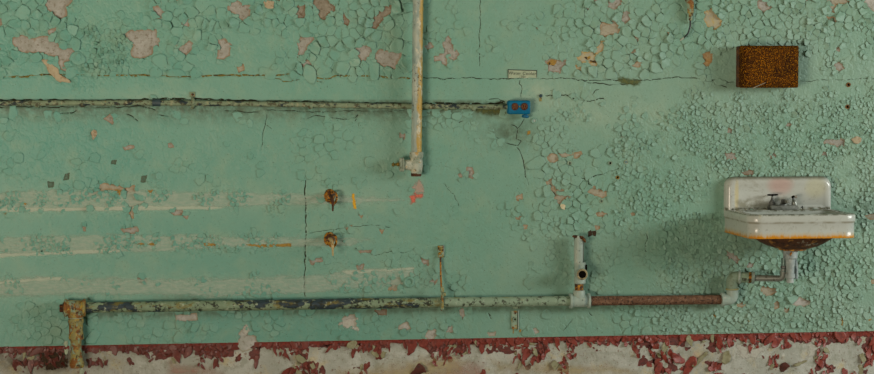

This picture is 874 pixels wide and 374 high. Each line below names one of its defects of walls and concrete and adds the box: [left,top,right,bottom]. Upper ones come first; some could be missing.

crack [0,0,730,149]
peeling [0,173,281,259]
crack [304,181,389,295]
peeling [79,76,874,374]
peeling [0,274,94,374]